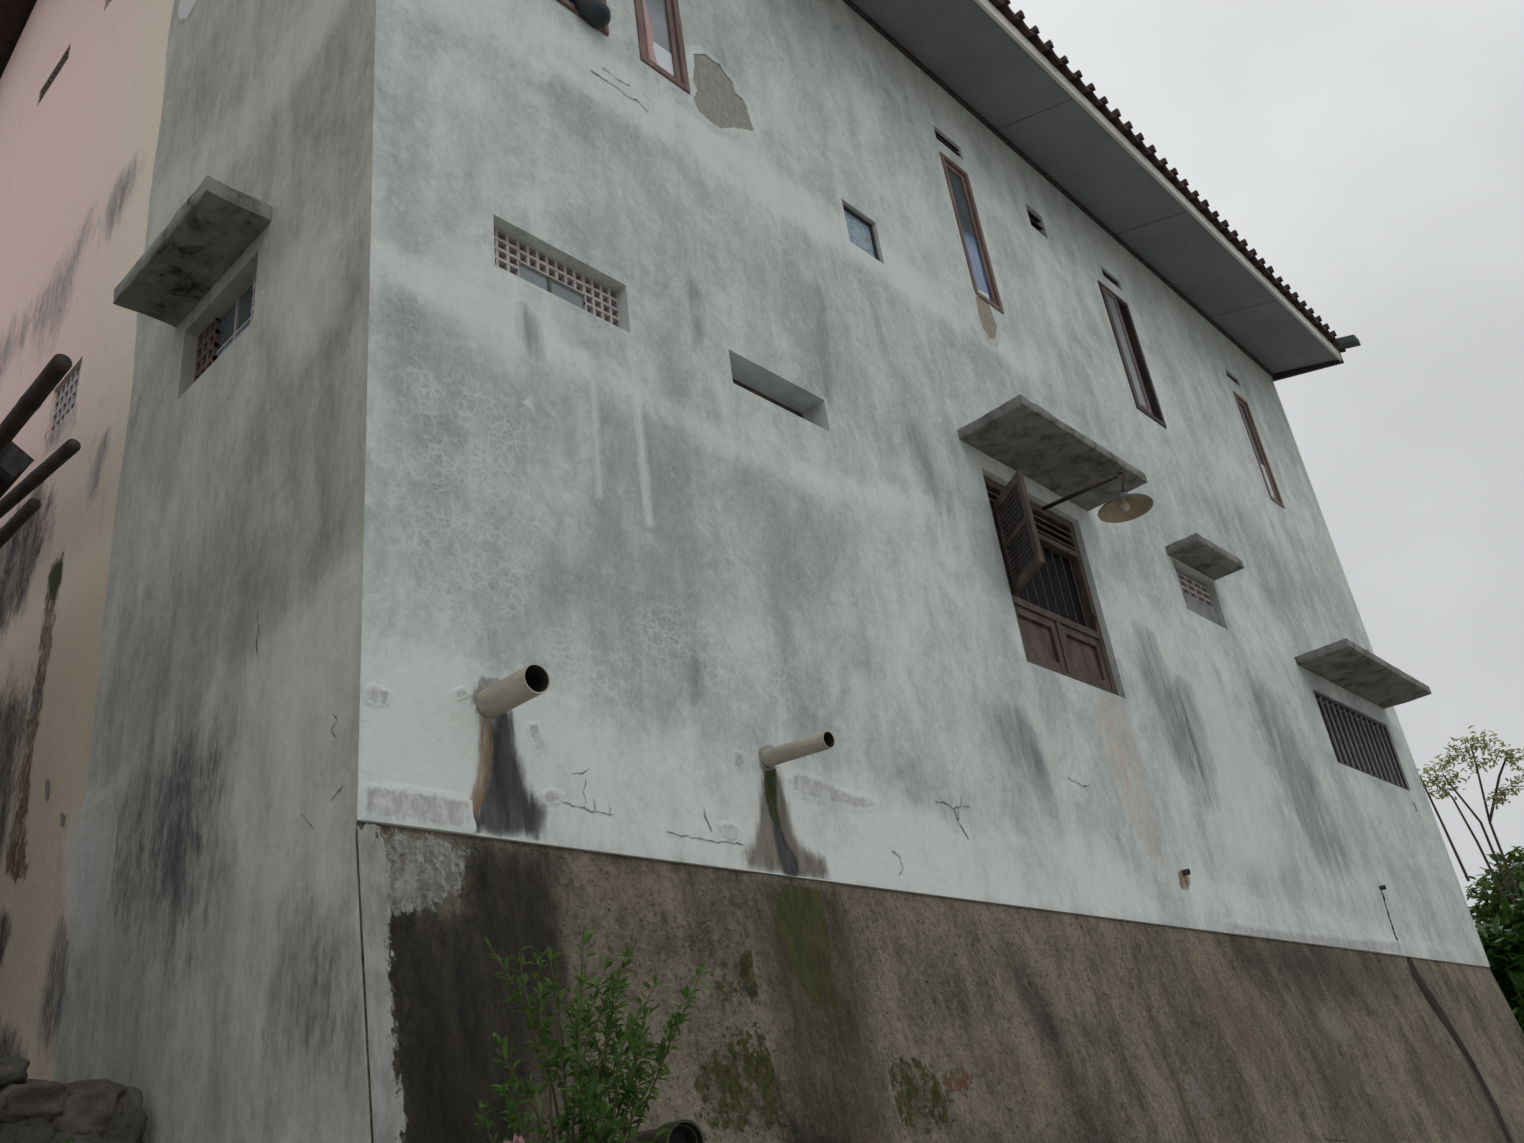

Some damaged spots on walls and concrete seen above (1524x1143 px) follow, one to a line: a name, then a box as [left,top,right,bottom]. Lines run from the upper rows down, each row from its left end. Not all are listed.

flaking render [685,45,760,140]
water stain [0,128,156,408]
flaking render [971,288,1001,347]
crack [362,318,823,815]
water stain [97,627,270,1038]
water stain [385,712,565,1143]
crack [666,805,745,845]
water stain [734,767,915,1143]
crack [936,795,970,839]